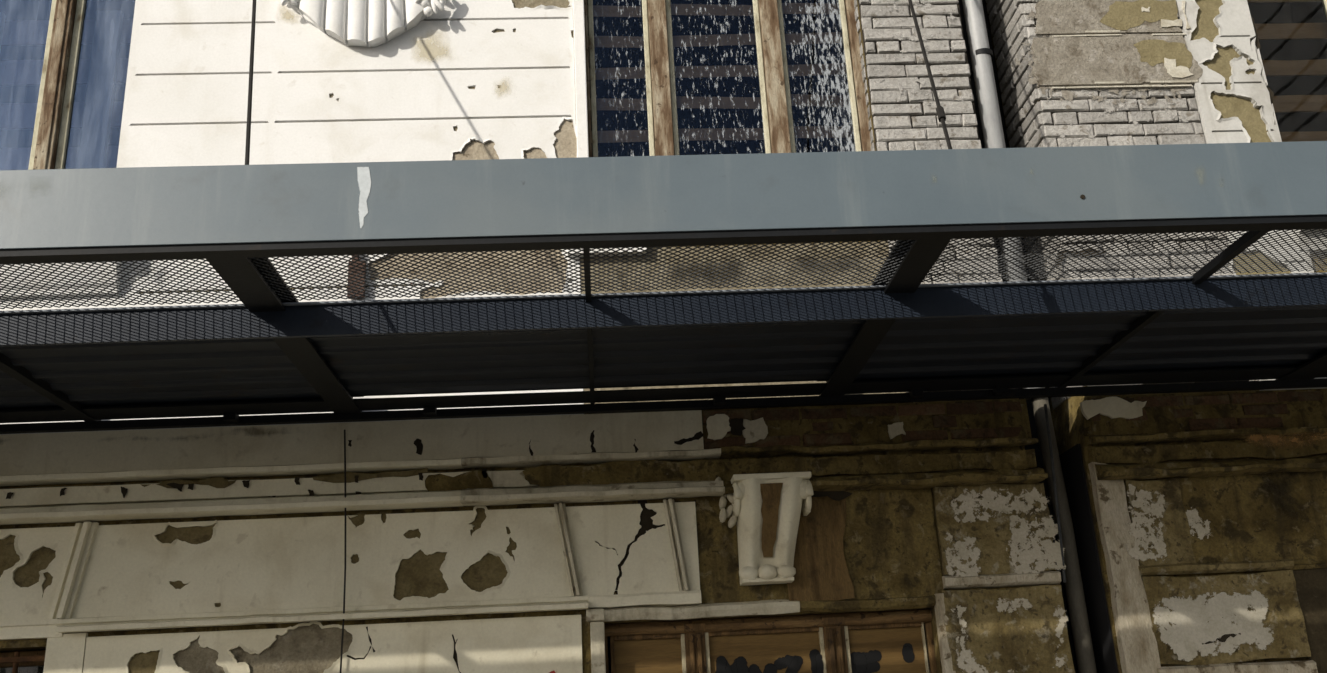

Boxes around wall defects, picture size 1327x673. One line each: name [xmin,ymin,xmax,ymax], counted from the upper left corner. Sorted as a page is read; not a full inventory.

spalling [508,0,573,11]
peeling [1100,0,1282,144]
peeling [1225,230,1314,275]
peeling [121,477,250,498]
spalling [295,439,493,496]
spalling [0,531,59,590]
spalling [152,520,219,547]
spalling [390,527,517,603]
crack [595,500,665,595]
peeling [1006,515,1066,574]
peeling [124,621,356,673]
crack [452,635,461,673]